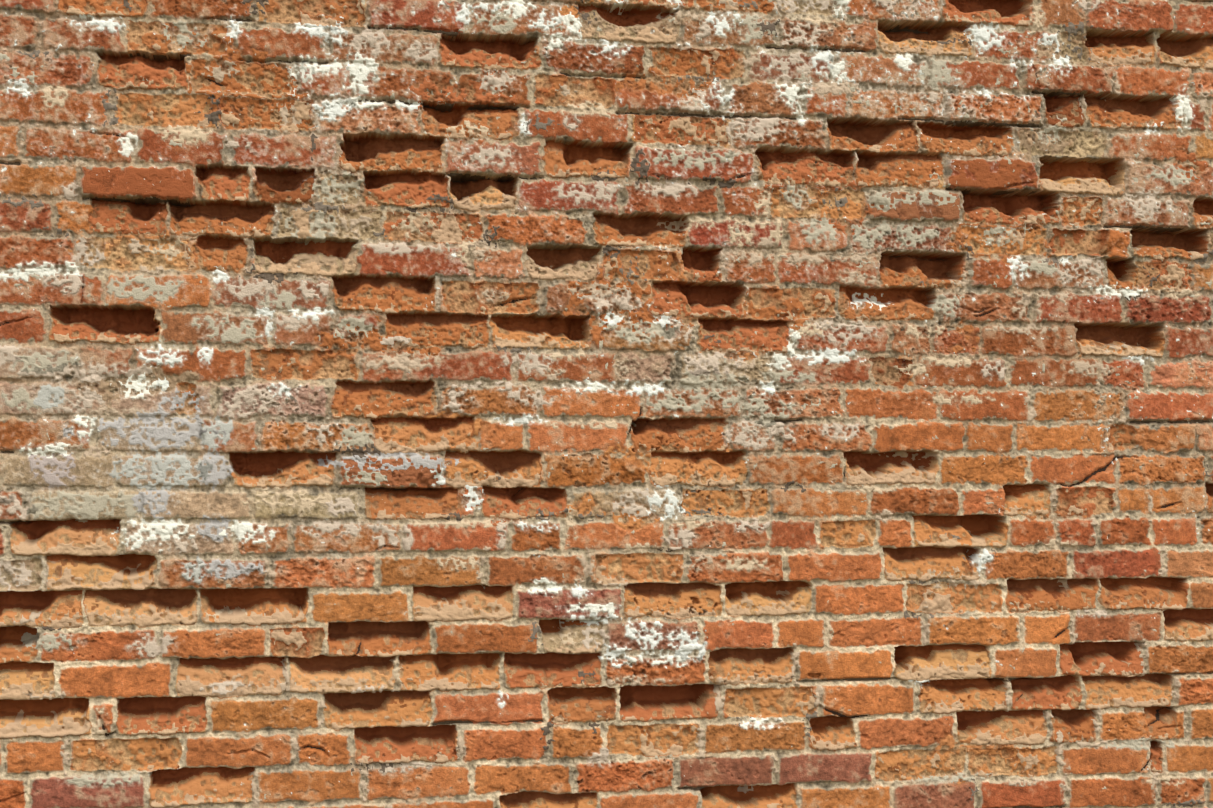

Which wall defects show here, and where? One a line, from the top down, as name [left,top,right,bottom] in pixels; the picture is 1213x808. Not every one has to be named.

spalling [559,0,678,32]
spalling [596,0,835,170]
peeling [549,167,698,209]
spalling [43,160,516,303]
peeling [981,360,1006,380]
peeling [0,238,877,596]
spalling [413,585,511,599]
peeling [1077,609,1108,618]
spalling [0,604,414,695]
spalling [504,619,609,670]
spalling [709,647,792,662]
peeling [351,676,499,694]